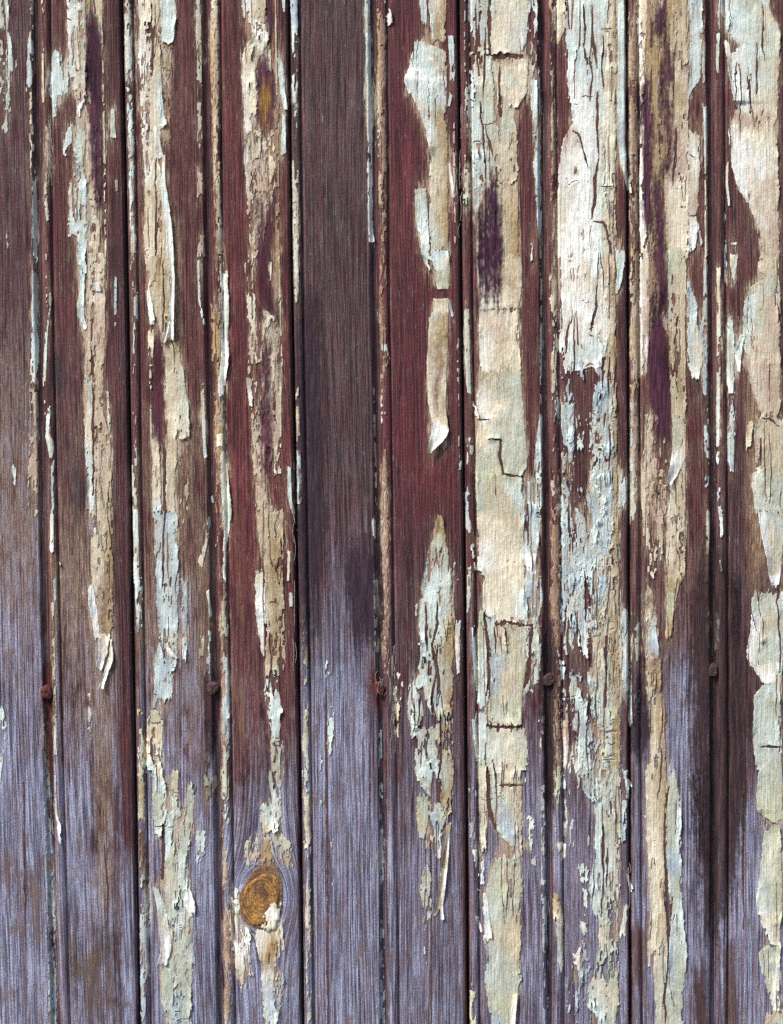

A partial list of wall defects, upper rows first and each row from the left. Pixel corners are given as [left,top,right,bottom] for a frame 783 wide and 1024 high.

peeling [365,0,392,243]
peeling [0,0,285,1024]
peeling [241,0,335,873]
crack [477,419,523,478]
peeling [372,0,783,1024]
rust [41,664,55,783]
rust [204,669,221,767]